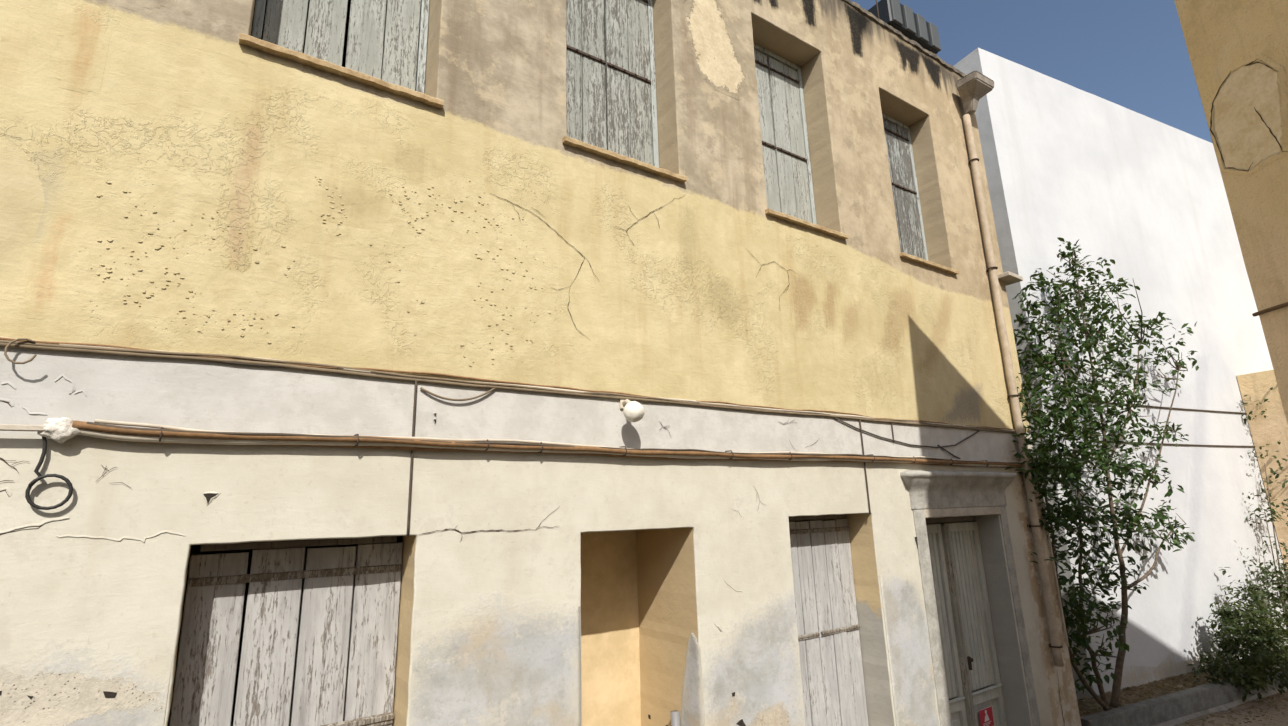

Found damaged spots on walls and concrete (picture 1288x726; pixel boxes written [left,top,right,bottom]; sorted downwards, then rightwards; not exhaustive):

peeling [683,0,748,101]
leakage [752,0,781,12]
leakage [800,0,818,30]
leakage [843,1,871,59]
flaking render [1208,53,1288,177]
peeling [0,635,172,726]
peeling [409,589,581,726]
peeling [680,580,805,726]
peeling [879,566,940,726]